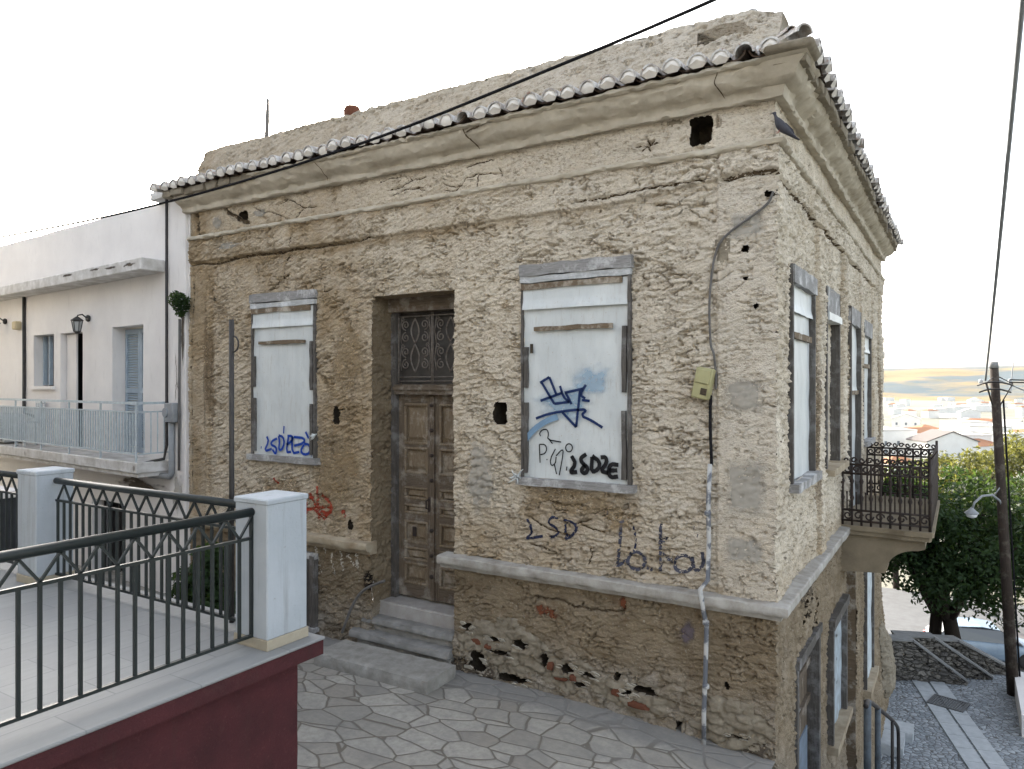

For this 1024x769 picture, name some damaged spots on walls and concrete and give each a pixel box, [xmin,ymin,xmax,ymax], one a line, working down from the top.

crack [381,124,503,196]
crack [193,162,370,292]
spalling [458,615,674,716]